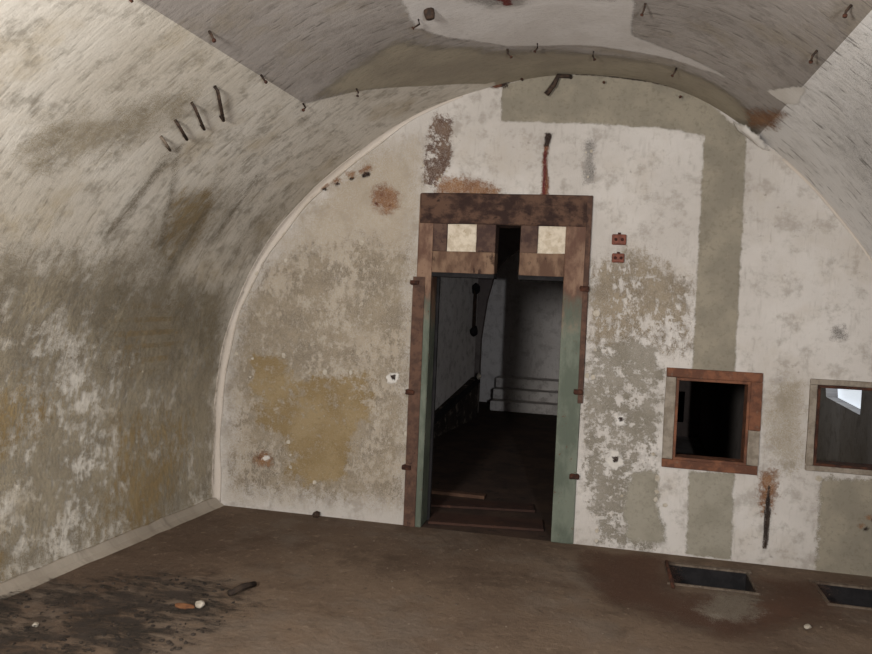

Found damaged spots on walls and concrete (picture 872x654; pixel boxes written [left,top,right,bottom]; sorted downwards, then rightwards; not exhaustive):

rust [465,0,534,10]
rust [742,107,788,132]
rust [540,132,552,195]
rust [369,181,403,216]
rust [434,173,501,194]
peeling [311,37,763,561]
peeling [0,228,417,581]